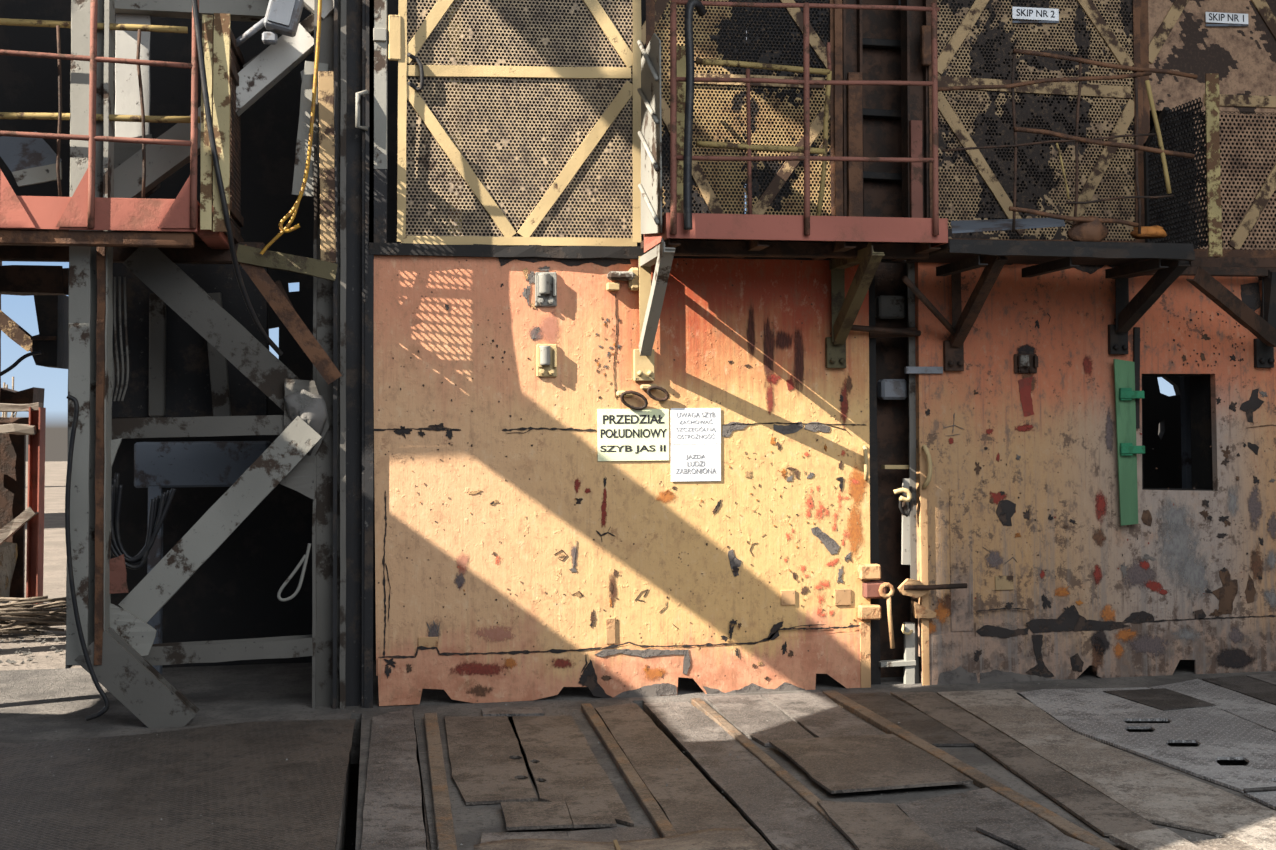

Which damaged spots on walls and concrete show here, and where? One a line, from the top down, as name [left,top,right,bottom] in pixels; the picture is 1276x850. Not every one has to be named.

corrosion [1017,344,1036,354]
corrosion [1015,373,1036,431]
peeling [1217,388,1268,423]
peeling [974,429,1077,540]
peeling [1210,442,1275,484]
peeling [699,422,860,616]
peeling [1193,523,1268,619]
peeling [721,619,742,658]
peeling [767,621,794,658]
peeling [937,594,1154,685]
peeling [578,649,690,698]
peeling [703,661,805,694]